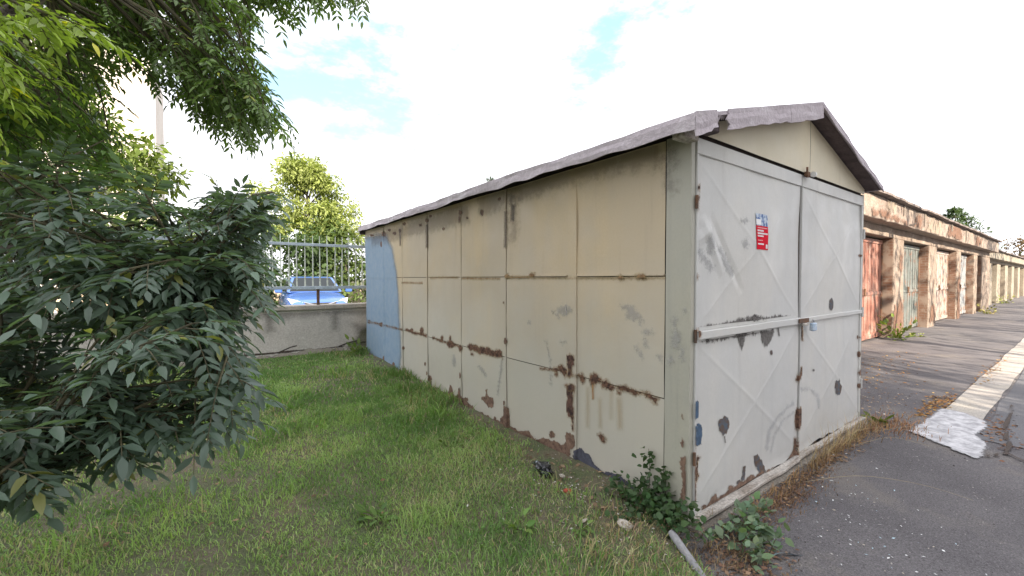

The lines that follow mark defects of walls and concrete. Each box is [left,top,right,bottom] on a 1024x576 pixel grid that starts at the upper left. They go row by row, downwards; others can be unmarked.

rust [368,322,502,357]
rust [540,355,658,430]
peeling [420,362,633,489]
peeling [679,401,702,501]
peeling [719,416,729,442]
rust [695,445,774,510]
peeling [737,454,766,484]
rust [788,408,802,459]